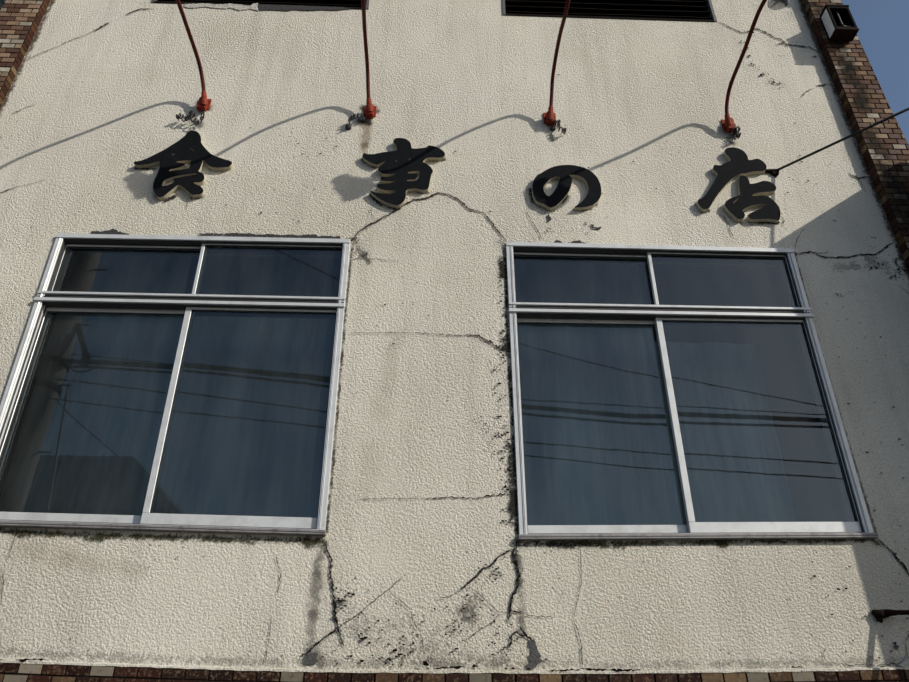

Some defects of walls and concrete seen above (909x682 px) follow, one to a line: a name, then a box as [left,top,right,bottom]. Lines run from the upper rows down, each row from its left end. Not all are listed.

crack [720,22,817,57]
crack [350,192,506,261]
crack [782,217,909,294]
crack [354,332,507,351]
damp [0,237,371,668]
damp [498,248,882,595]
crack [877,538,909,575]
crack [301,544,424,657]
crack [440,541,583,667]